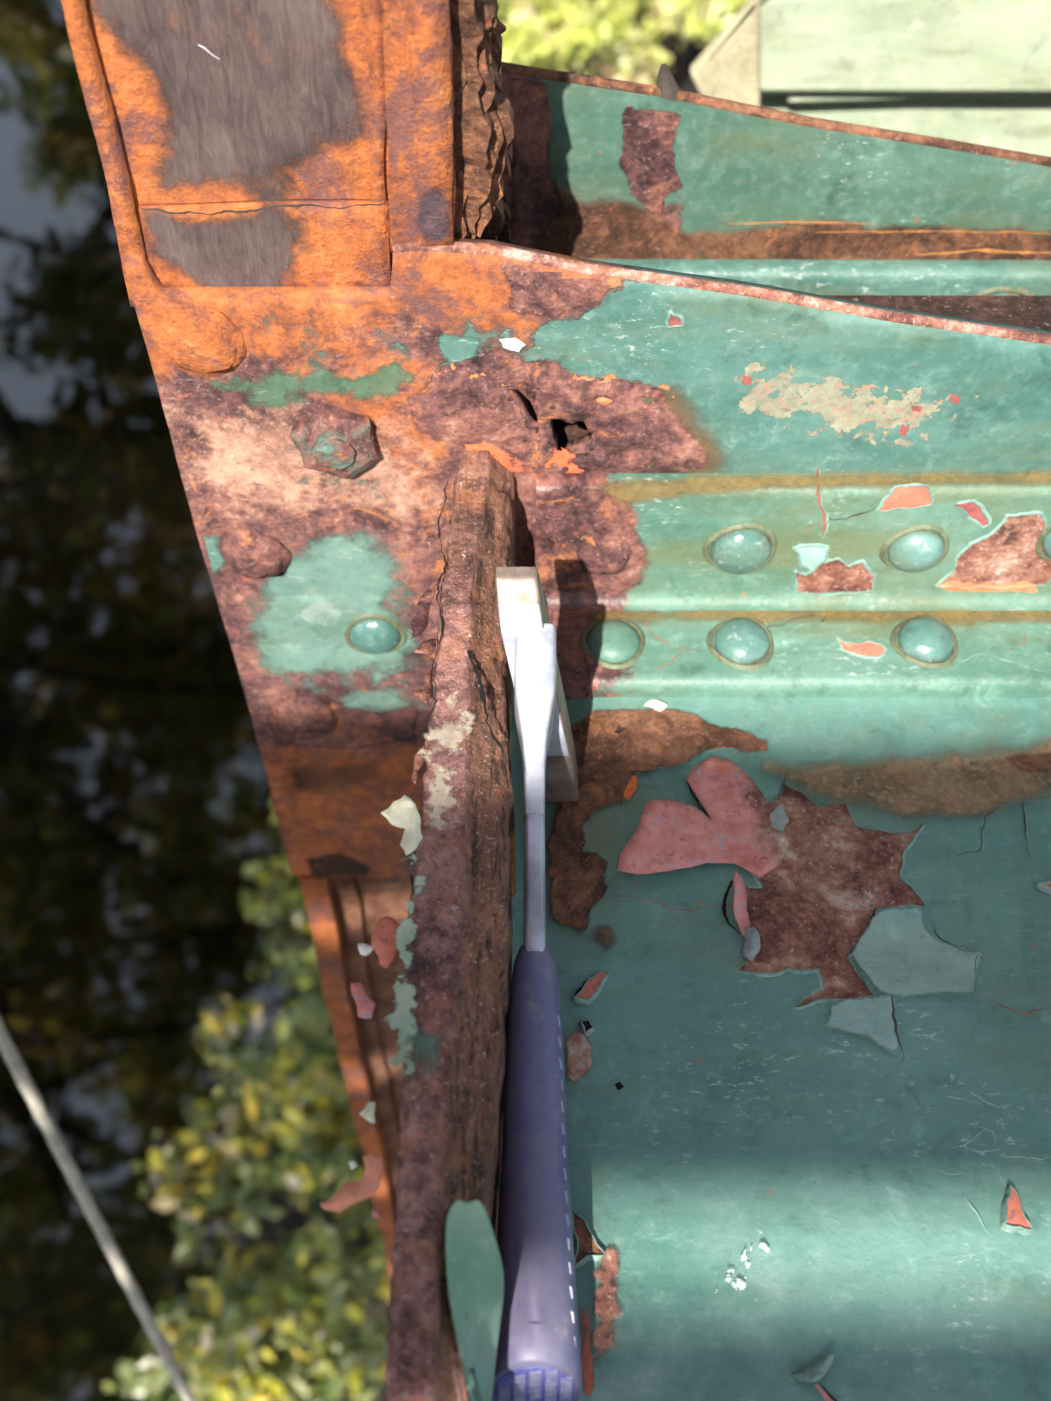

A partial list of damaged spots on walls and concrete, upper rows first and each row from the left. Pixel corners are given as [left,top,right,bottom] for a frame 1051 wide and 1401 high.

rust [416,190,448,241]
rust [510,79,1051,260]
rust [502,265,609,317]
peeling [728,362,979,447]
rust [408,338,1051,593]
peeling [875,483,935,513]
peeling [792,543,876,597]
peeling [934,499,1051,592]
rust [267,578,439,785]
peeling [381,795,423,855]
rust [546,609,1051,948]
peeling [614,756,982,1051]